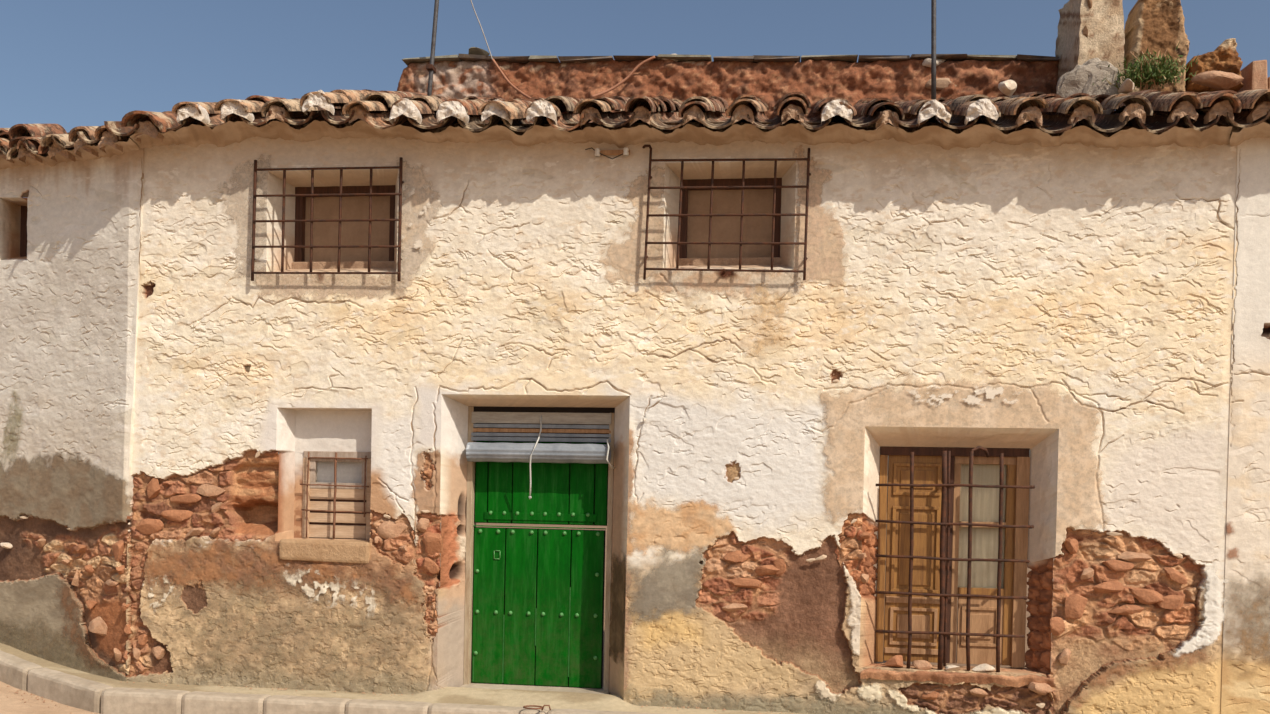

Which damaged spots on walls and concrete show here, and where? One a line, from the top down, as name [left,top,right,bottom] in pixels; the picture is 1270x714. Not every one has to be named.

crack [137,158,145,277]
crack [204,297,363,317]
crack [648,339,761,378]
water stain [0,392,133,530]
water stain [0,586,111,674]
flaking render [0,450,279,677]
flaking render [285,569,376,616]
flaking render [371,450,443,641]
flaking render [696,370,1228,714]
water stain [1227,582,1270,664]